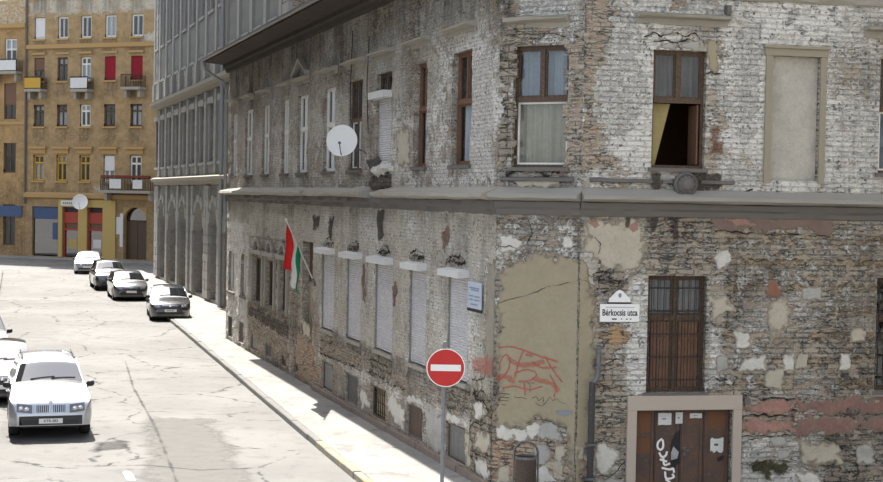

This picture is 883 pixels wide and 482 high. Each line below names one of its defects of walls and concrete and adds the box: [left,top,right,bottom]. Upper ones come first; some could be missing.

crack [644,31,705,52]
spalling [498,224,533,254]
spalling [563,218,649,297]
peeling [713,248,732,271]
crack [497,279,595,304]
peeling [708,294,737,320]
peeling [839,327,867,371]
spalling [730,274,844,482]
rust [637,412,651,453]
rust [707,411,726,429]
spalling [852,439,875,465]
damp [751,460,788,480]